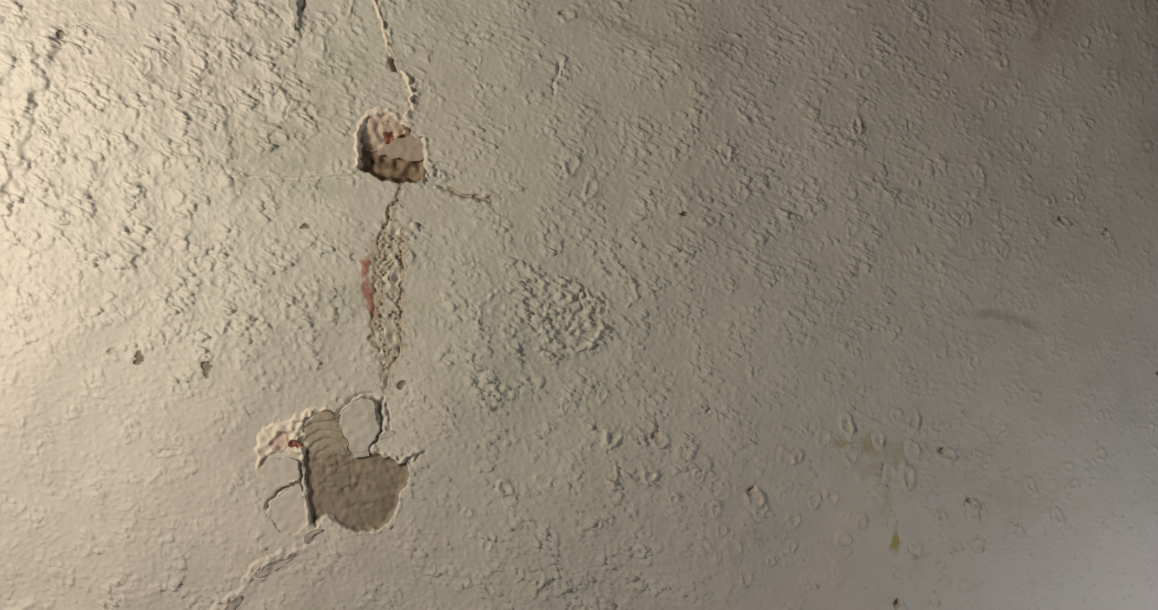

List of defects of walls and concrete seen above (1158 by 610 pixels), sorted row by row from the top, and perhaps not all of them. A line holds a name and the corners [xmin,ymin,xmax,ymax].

crack [370,0,418,127]
flaking render [253,106,449,537]
crack [330,384,397,449]
crack [189,511,330,610]